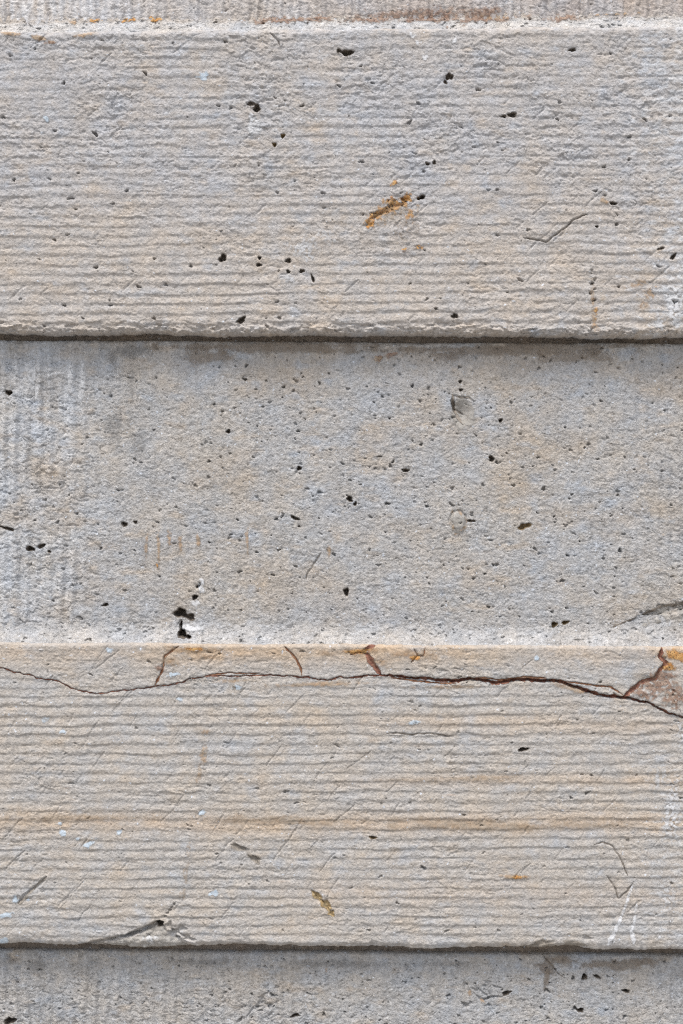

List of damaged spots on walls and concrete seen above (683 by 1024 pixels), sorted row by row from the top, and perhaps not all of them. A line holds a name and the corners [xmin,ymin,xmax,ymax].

corrosion [365,180,414,228]
crack [0,644,682,718]
corrosion [662,648,683,670]